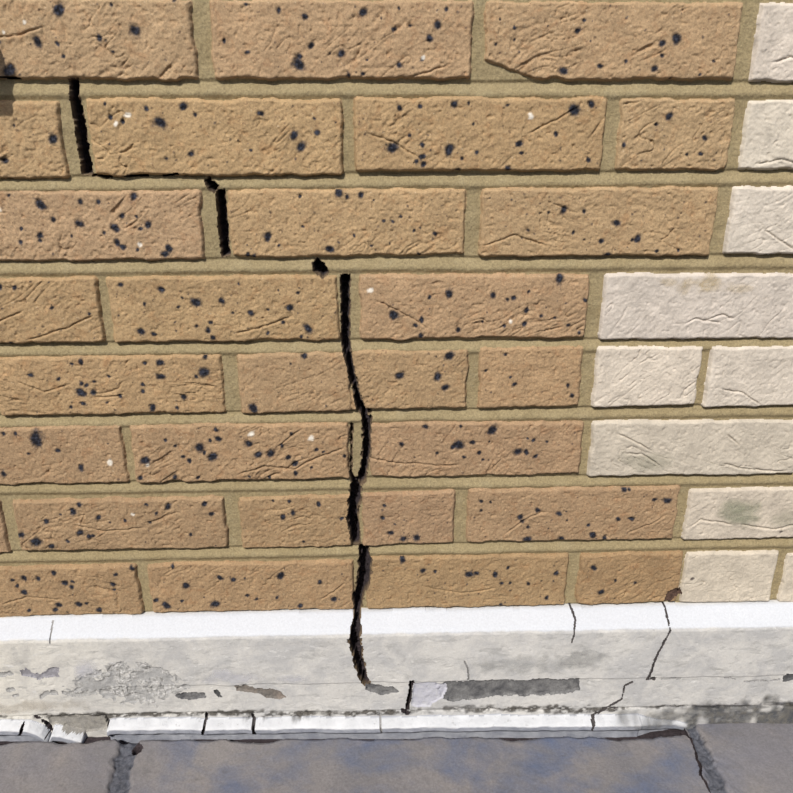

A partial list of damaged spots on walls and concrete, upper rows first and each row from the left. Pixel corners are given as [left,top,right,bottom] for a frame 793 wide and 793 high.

crack [0,73,21,81]
crack [67,77,179,179]
crack [204,176,231,258]
crack [311,257,373,686]
peeling [0,661,222,707]
spalling [411,678,580,708]
crack [482,601,711,793]
crack [724,675,781,683]
crack [0,715,138,745]
crack [162,712,282,743]